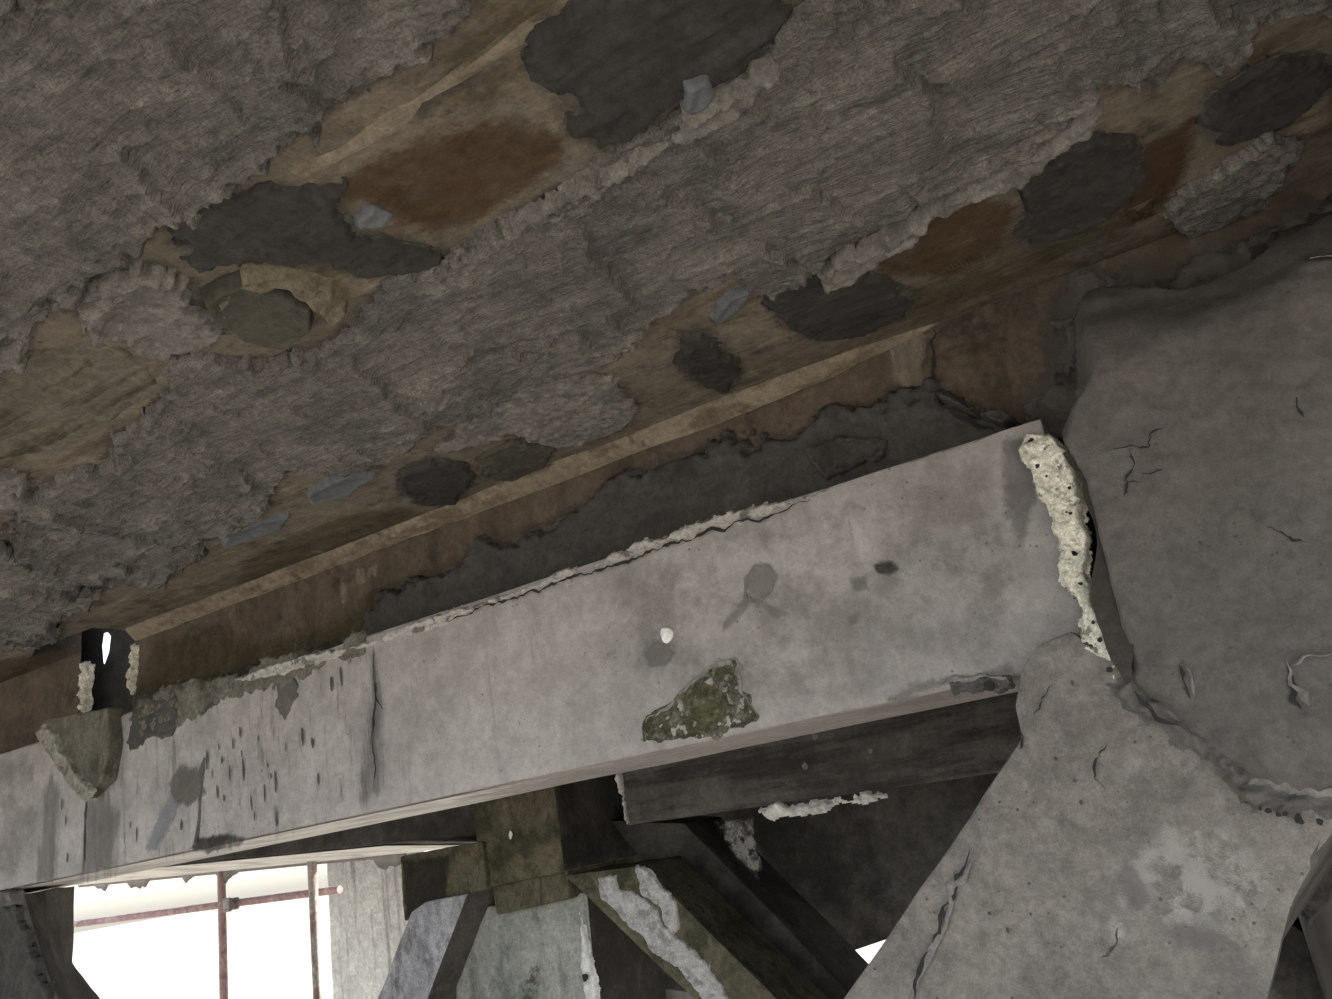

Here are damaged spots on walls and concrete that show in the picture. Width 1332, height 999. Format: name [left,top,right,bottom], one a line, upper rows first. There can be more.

peeling [0,339,165,460]
peeling [595,494,814,567]
spalling [935,393,1115,686]
spalling [77,661,95,713]
peeling [125,567,577,751]
spalling [641,658,760,743]
crack [1135,662,1195,726]
crack [1286,660,1310,710]
spalling [206,727,244,801]
peeling [758,790,888,821]
peeling [598,865,729,999]
crack [910,844,981,999]